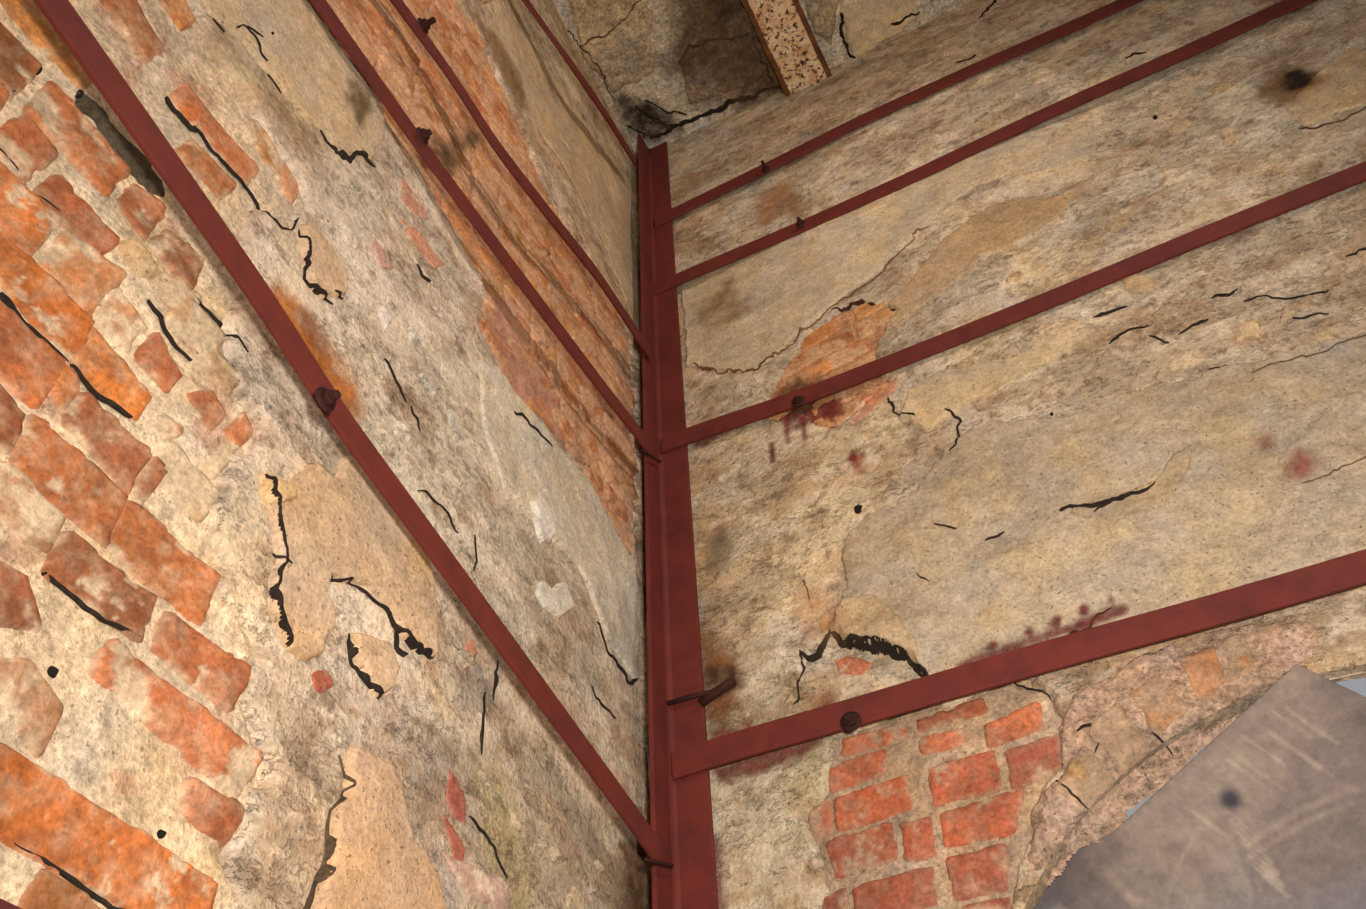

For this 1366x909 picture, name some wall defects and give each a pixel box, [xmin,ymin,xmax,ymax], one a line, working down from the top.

peeling [956,77,984,91]
peeling [1162,126,1246,187]
crack [164,96,344,305]
peeling [681,121,1097,432]
peeling [1122,273,1155,293]
peeling [1344,224,1366,262]
peeling [834,326,1366,675]
crack [264,474,294,647]
crack [330,577,434,659]
crack [347,633,384,699]
crack [793,629,928,704]
crack [302,755,357,909]